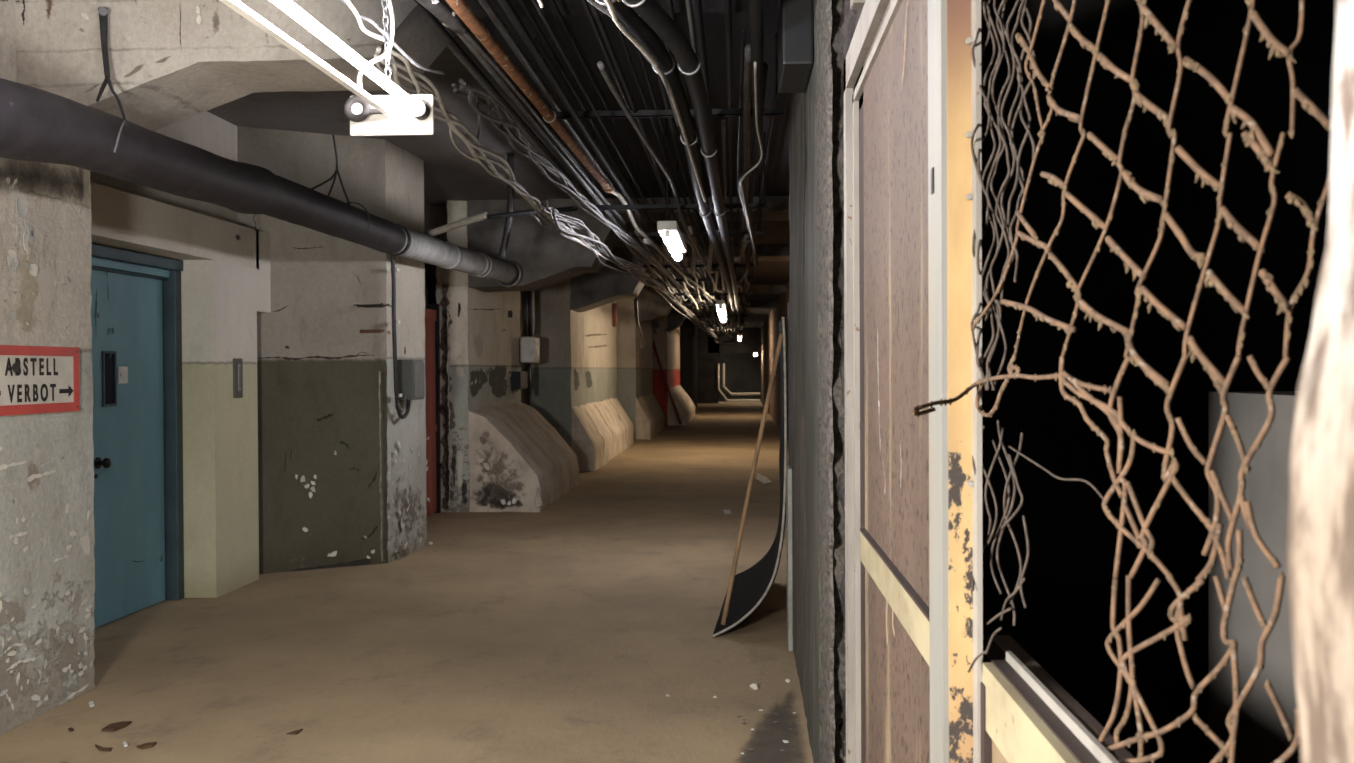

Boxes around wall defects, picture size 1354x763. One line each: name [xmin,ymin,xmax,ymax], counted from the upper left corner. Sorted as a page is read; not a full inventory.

spalling [363,284,516,561]
damp [477,432,523,509]
peeling [0,588,93,712]